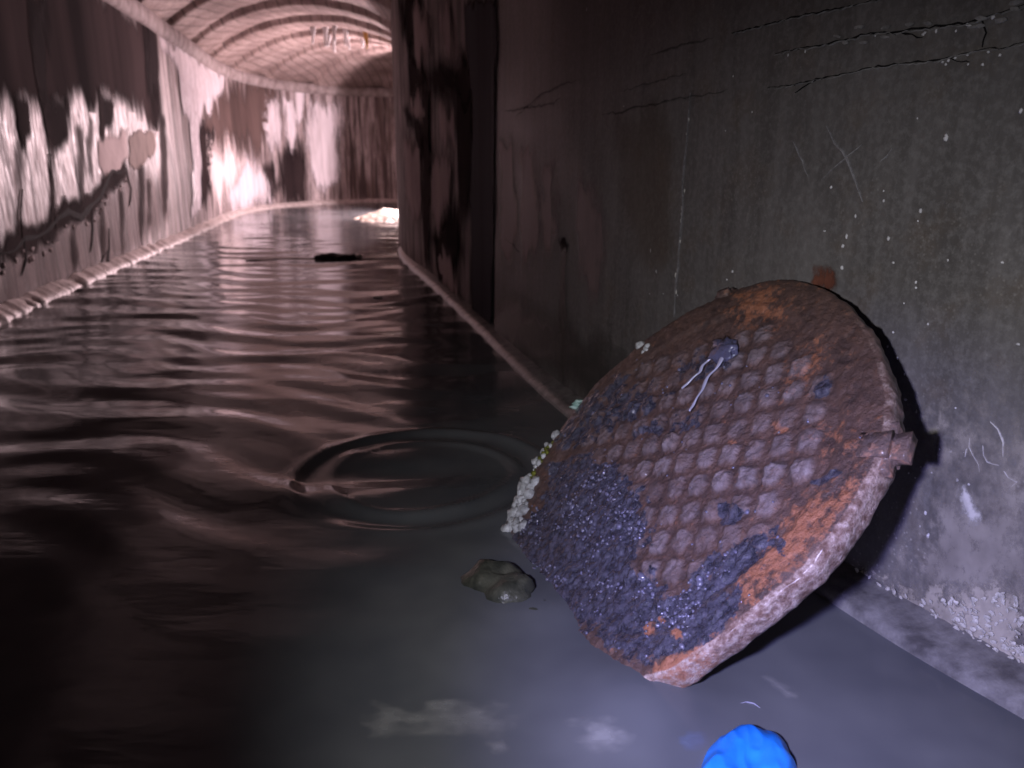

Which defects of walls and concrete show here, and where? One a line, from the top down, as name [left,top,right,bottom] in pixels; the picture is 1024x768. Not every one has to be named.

damp [71,228,79,270]
damp [0,0,169,243]
damp [398,0,609,389]
crack [731,0,1024,93]